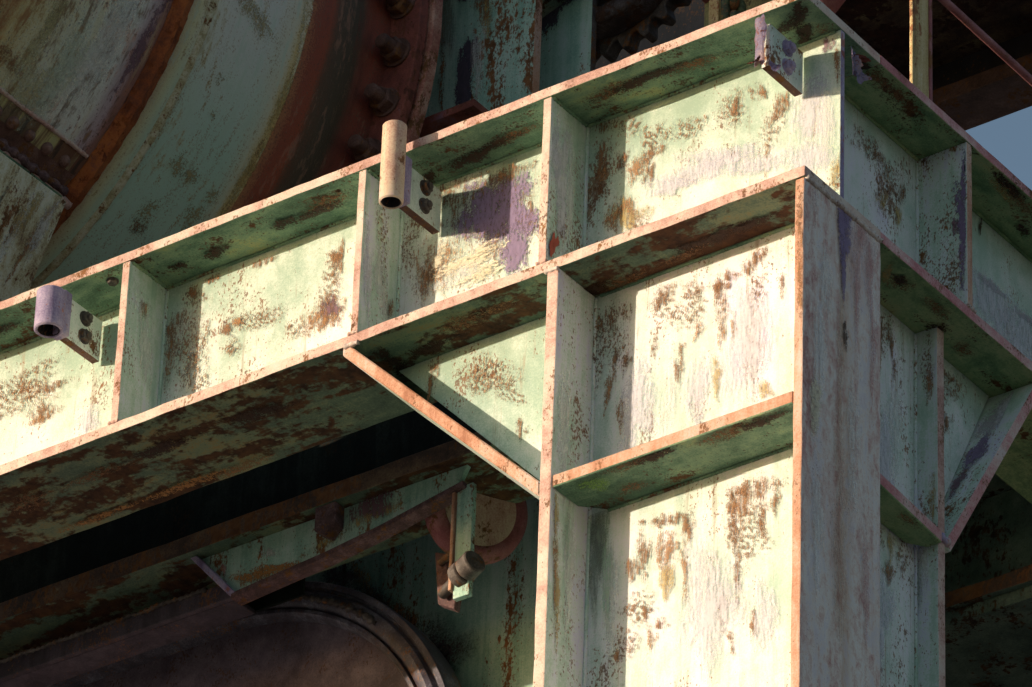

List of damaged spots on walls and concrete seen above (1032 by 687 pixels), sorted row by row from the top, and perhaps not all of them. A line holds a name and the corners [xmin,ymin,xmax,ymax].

corrosion [110,0,171,101]
corrosion [569,48,791,233]
corrosion [851,123,906,224]
corrosion [0,357,75,426]
corrosion [60,451,278,533]
corrosion [577,445,682,495]
corrosion [584,211,783,434]
corrosion [699,410,789,447]
corrosion [919,298,962,432]
corrosion [612,510,695,662]
corrosion [718,476,786,654]